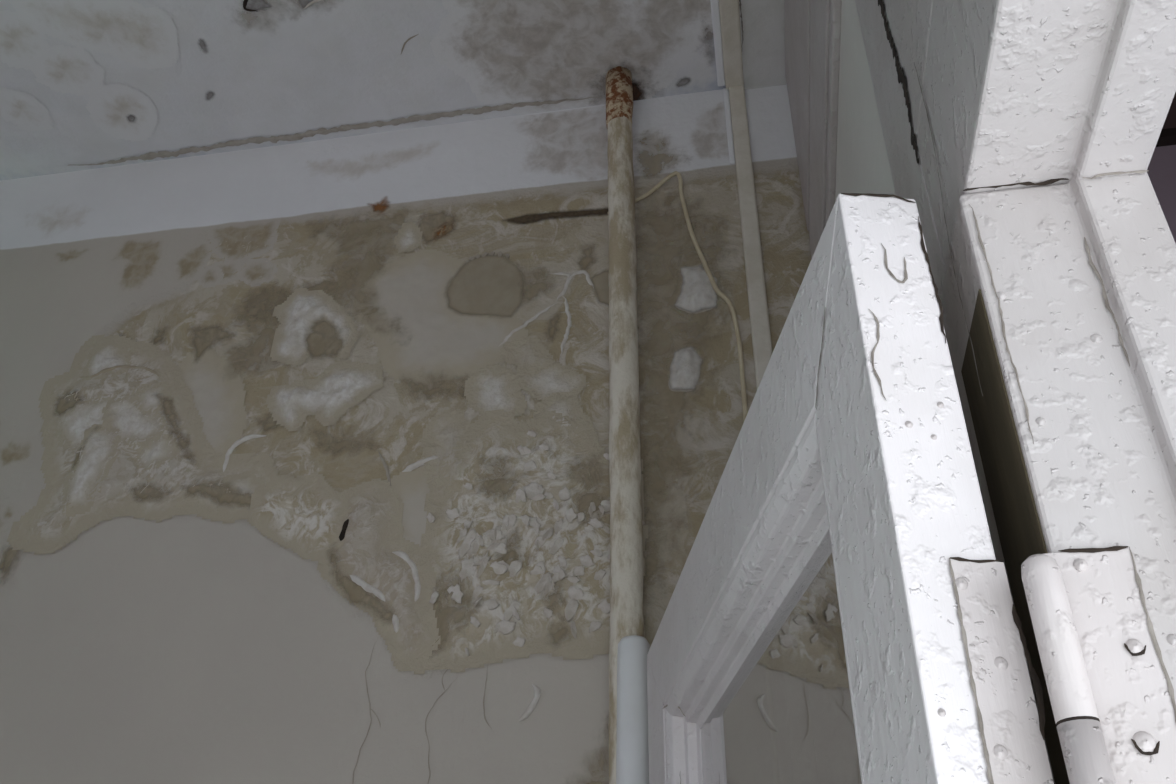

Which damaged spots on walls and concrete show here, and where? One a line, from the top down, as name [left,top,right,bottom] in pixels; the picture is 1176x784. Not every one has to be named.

peeling [243,0,270,12]
spalling [632,82,644,101]
water stain [0,0,757,647]
peeling [499,270,594,354]
peeling [668,347,701,392]
peeling [675,266,717,314]
water stain [752,161,811,353]
peeling [411,409,610,675]
crack [352,639,381,784]
crack [425,669,457,784]